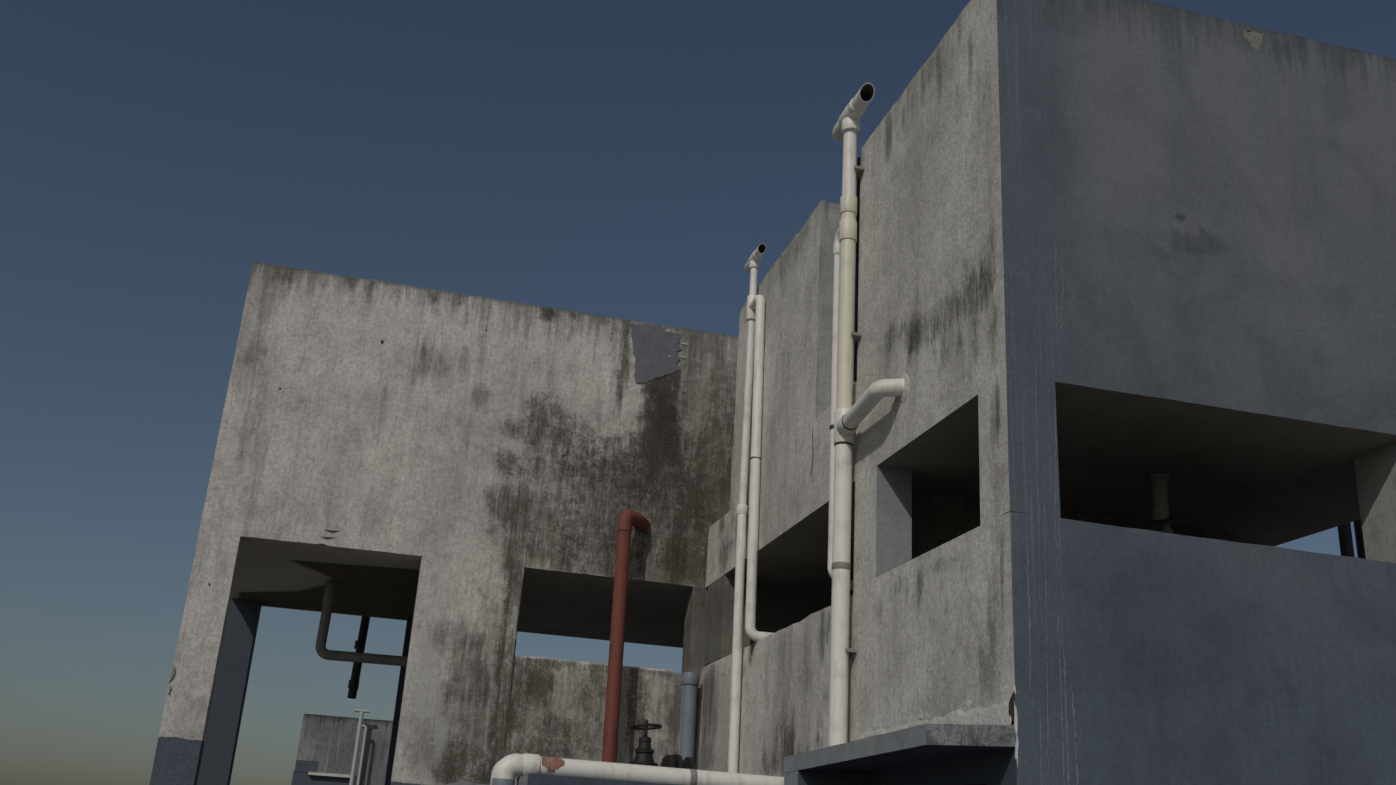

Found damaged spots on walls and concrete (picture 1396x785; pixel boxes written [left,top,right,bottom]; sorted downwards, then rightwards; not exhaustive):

water stain [887,238,995,359]
water stain [505,373,749,585]
water stain [432,454,585,784]